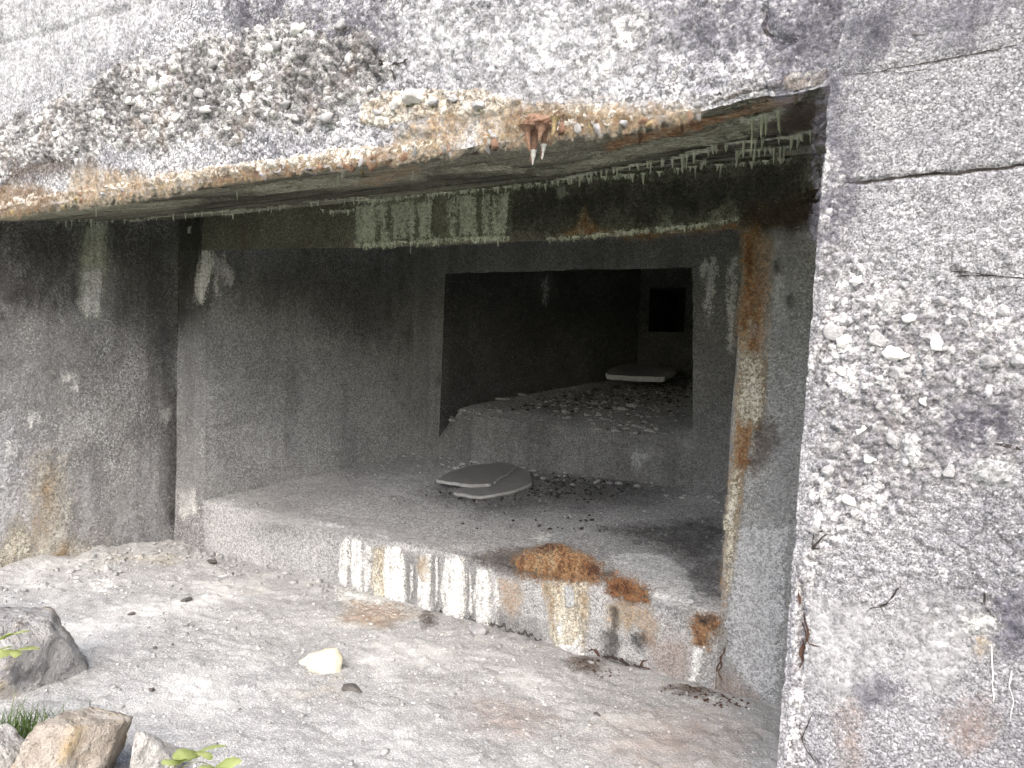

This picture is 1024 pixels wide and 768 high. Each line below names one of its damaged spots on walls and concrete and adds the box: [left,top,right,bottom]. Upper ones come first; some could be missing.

water stain [0,0,899,333]
crack [845,164,1024,184]
corrosion [559,201,773,697]
water stain [334,536,500,627]
water stain [529,532,557,544]
corrosion [474,542,655,631]
water stain [542,582,640,674]
water stain [601,519,724,597]